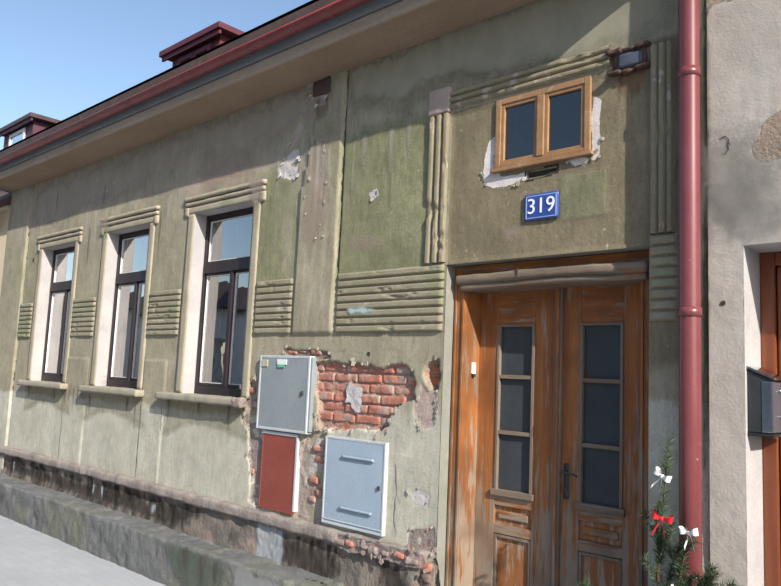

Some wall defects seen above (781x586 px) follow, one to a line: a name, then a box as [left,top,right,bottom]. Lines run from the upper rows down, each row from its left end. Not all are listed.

water stain [350,0,668,103]
peeling [278,121,330,204]
flaking render [480,137,527,188]
flaking render [565,97,605,166]
flaking render [752,111,781,162]
flaking render [240,373,263,510]
flaking render [282,345,443,524]
water stain [263,526,340,577]
flaking render [334,526,440,586]
water stain [379,562,406,586]